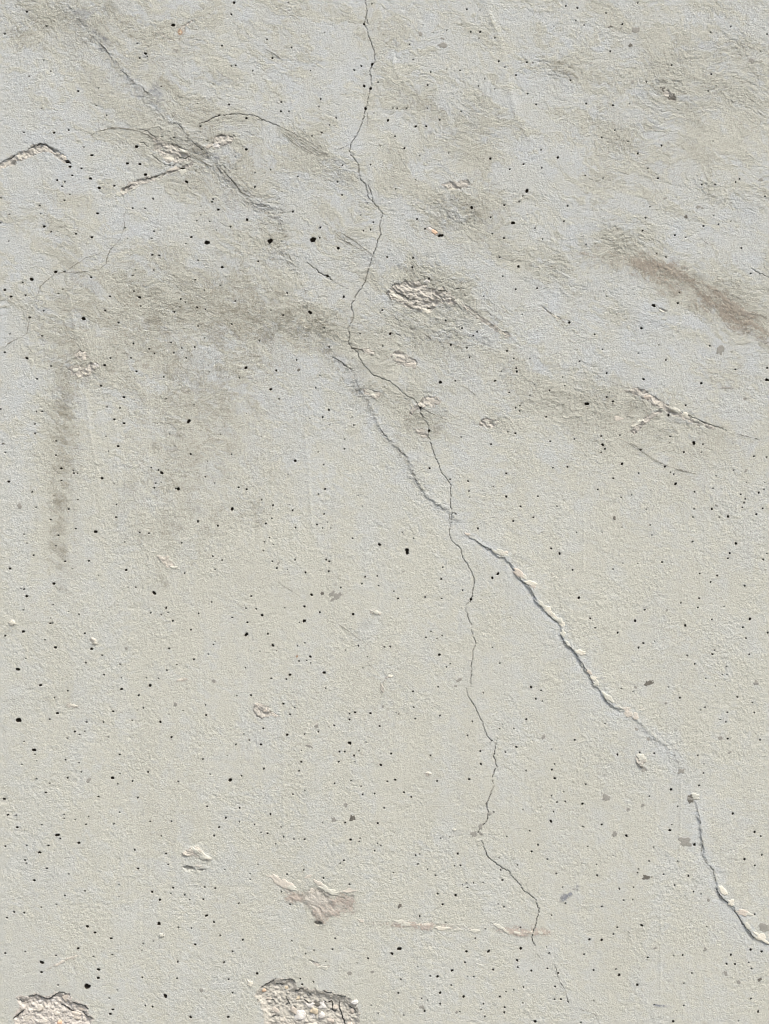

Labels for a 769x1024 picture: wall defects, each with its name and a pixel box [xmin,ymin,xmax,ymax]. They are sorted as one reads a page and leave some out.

crack [6,212,126,346]
peeling [386,280,513,337]
peeling [266,874,357,921]
spalling [13,991,95,1024]
spalling [247,977,361,1024]